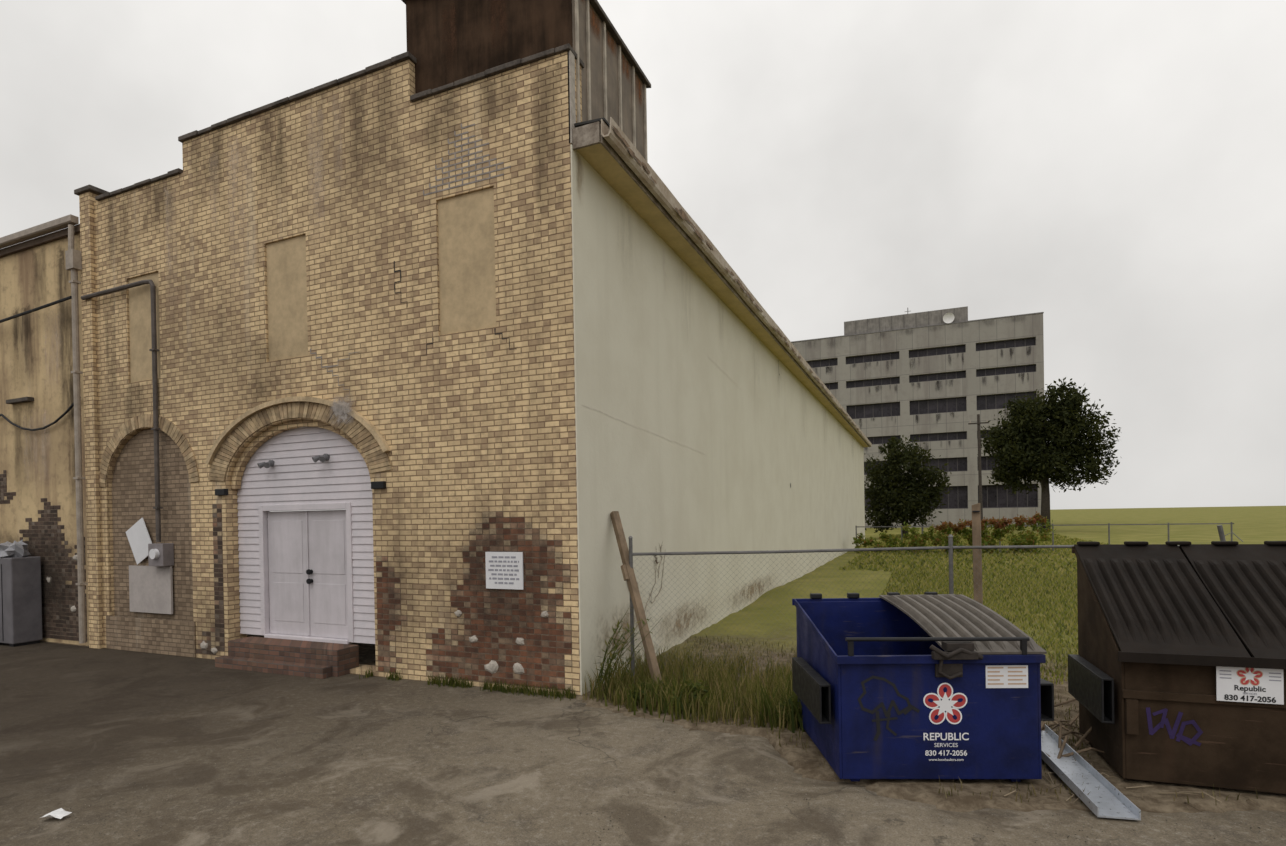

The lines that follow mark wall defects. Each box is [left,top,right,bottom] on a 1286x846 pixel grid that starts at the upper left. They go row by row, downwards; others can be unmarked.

leakage [59,250,72,359]
spalling [0,470,16,504]
spalling [19,498,87,642]
spalling [376,556,407,673]
spalling [426,511,573,691]